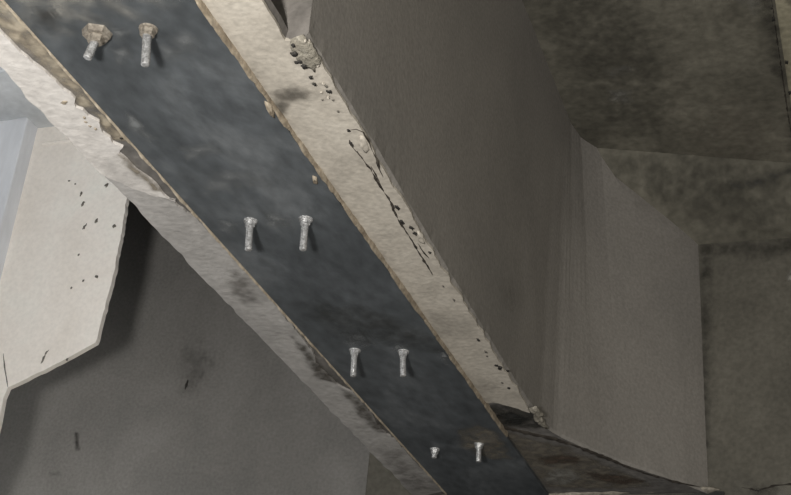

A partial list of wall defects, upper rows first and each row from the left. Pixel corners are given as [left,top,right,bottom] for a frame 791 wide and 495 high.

crack [347,129,433,275]
crack [742,483,791,492]